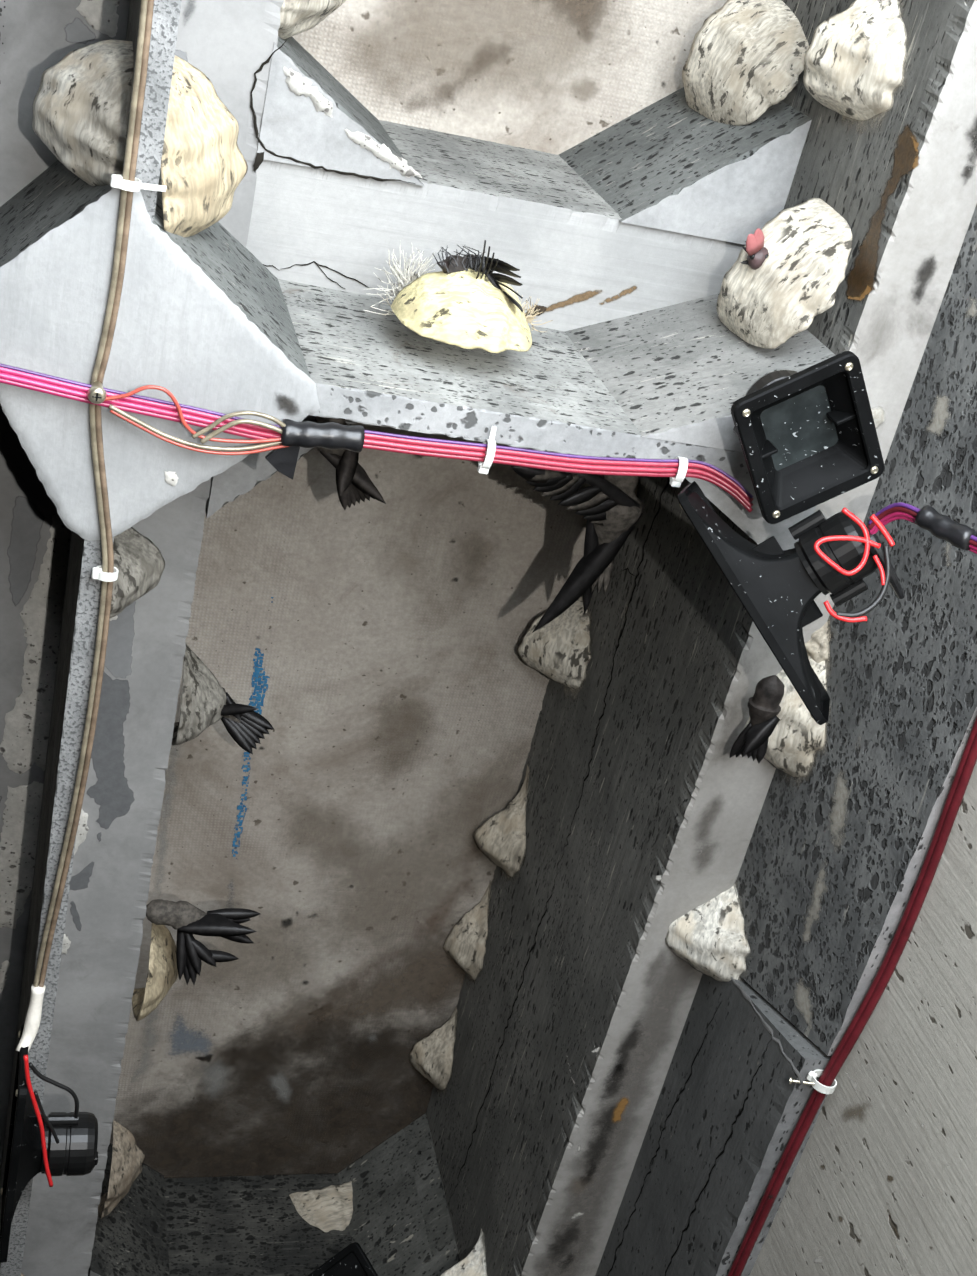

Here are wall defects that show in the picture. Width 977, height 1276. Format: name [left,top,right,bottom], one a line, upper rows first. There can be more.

peeling [65,0,120,43]
leakage [557,0,601,39]
crack [250,41,416,184]
spalling [345,129,422,178]
rust [846,125,919,301]
peeling [0,496,71,929]
spalling [74,601,136,855]
leakage [698,801,719,866]
spalling [61,862,94,954]
leakage [130,916,466,1178]
leakage [537,954,692,1276]
rust [613,1098,628,1122]